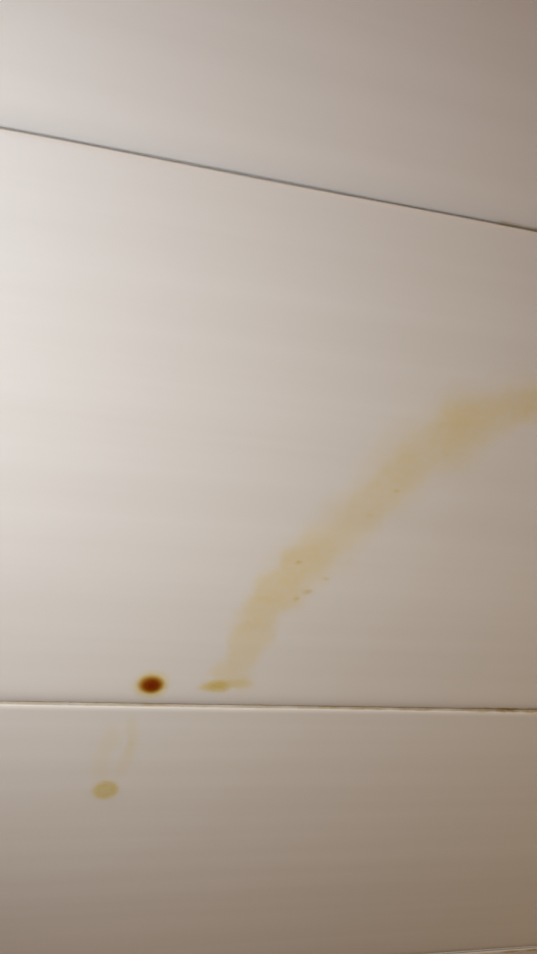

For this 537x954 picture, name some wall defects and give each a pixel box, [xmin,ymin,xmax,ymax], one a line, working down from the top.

corrosion [144,680,158,690]